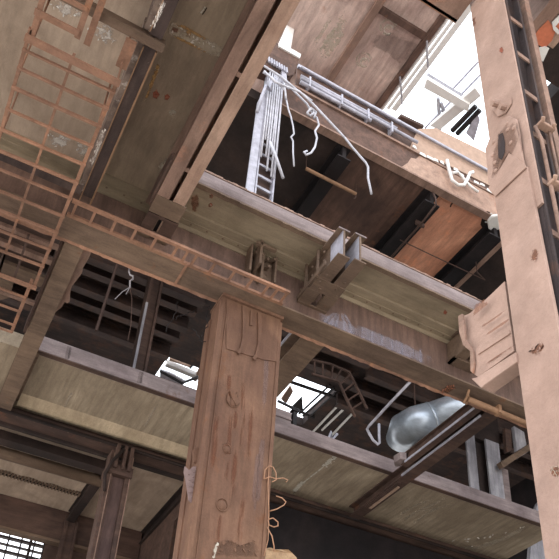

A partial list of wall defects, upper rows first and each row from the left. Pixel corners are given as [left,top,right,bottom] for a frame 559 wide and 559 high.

rust [196,169,335,246]
rust [361,244,487,316]